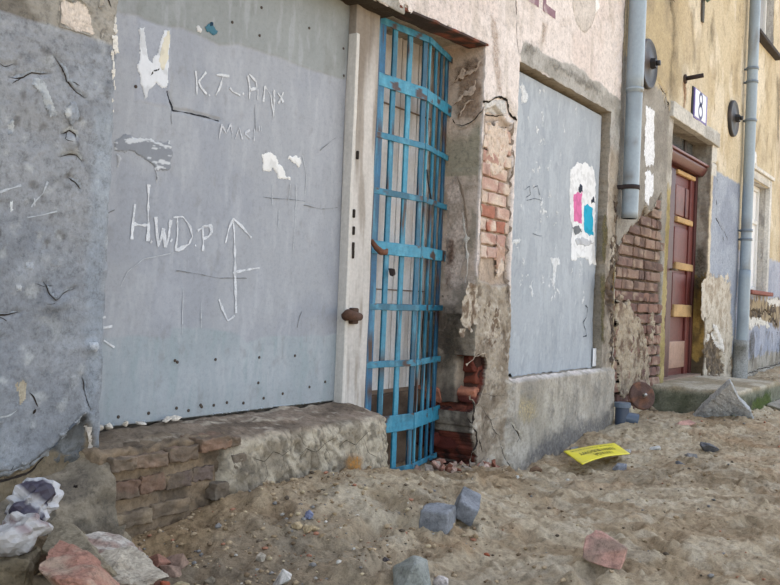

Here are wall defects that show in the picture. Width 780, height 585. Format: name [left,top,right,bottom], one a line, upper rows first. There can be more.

crack [1,57,85,98]
flaking render [59,0,119,112]
flaking render [418,60,522,411]
peeling [520,247,560,301]
flaking render [607,193,665,410]
peeling [701,272,733,376]
peeling [749,297,780,331]
spalling [416,425,459,450]
crack [465,394,522,467]